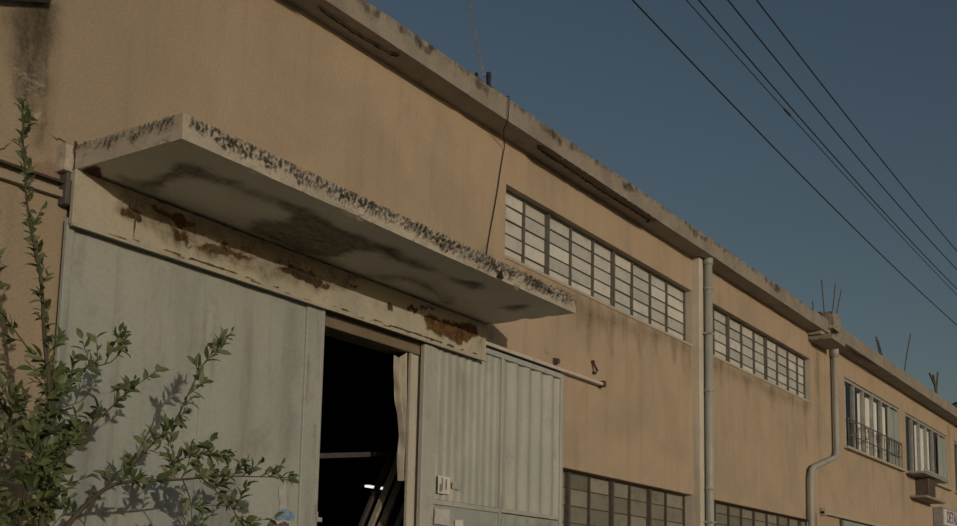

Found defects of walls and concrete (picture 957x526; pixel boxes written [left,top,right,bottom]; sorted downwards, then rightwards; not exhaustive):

rust [110,198,142,241]
rust [151,204,259,284]
leakage [252,202,430,274]
rust [280,265,330,290]
rust [360,305,478,354]